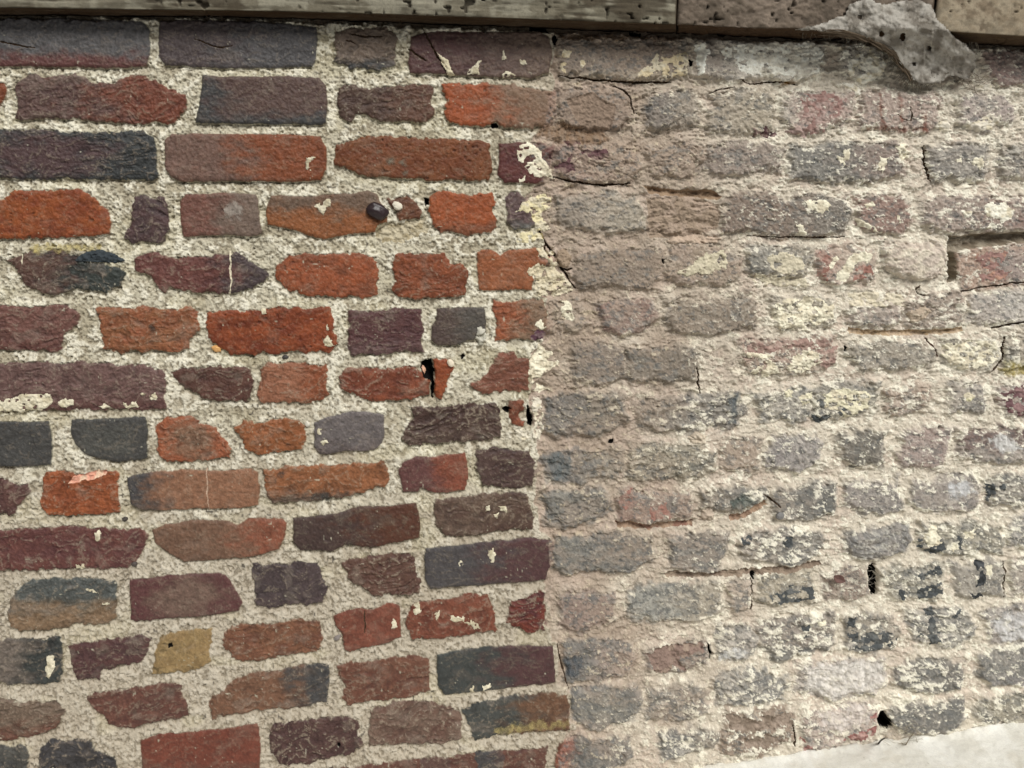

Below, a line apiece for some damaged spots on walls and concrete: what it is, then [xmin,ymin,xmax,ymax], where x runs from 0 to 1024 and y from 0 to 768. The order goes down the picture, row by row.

crack [558,75,671,114]
peeling [517,92,617,182]
crack [897,106,931,182]
crack [960,281,1024,293]
crack [989,321,1024,373]